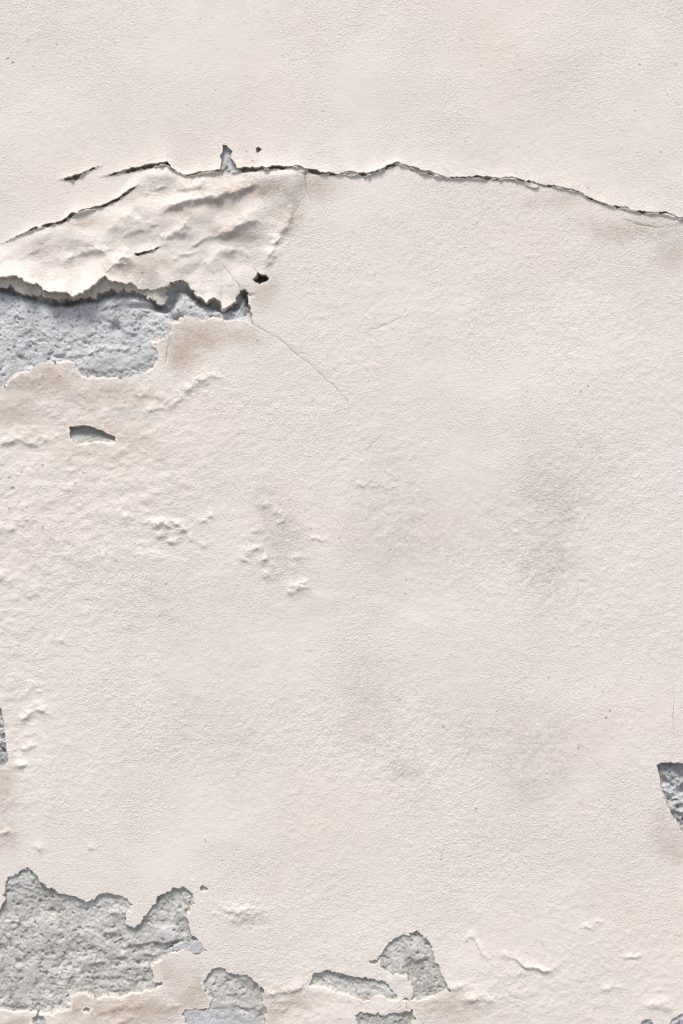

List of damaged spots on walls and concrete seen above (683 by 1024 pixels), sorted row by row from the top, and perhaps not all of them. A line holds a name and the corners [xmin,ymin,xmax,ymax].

crack [6,161,683,242]
spalling [0,145,303,389]
spalling [69,425,116,446]
spalling [657,762,683,833]
spalling [0,867,209,1024]
spalling [181,967,268,1024]
spalling [309,930,451,1024]